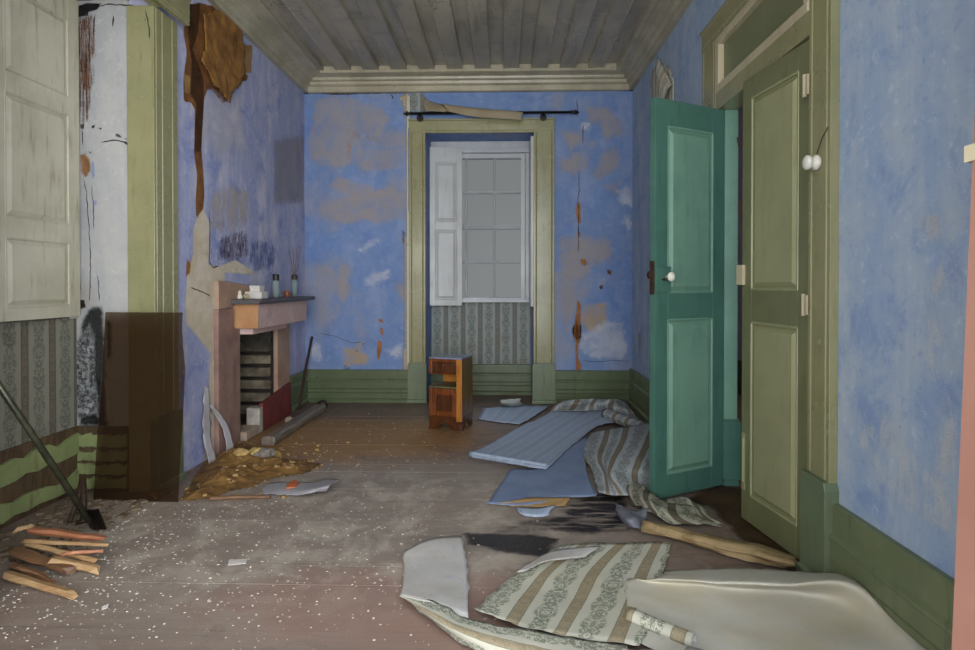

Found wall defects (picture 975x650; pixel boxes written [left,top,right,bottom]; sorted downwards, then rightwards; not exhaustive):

corrosion [78,15,97,128]
corrosion [80,153,91,177]
crack [84,181,100,301]
water stain [77,306,113,426]
flaking render [183,3,256,460]
corrosion [574,300,582,370]
peeling [557,233,641,361]